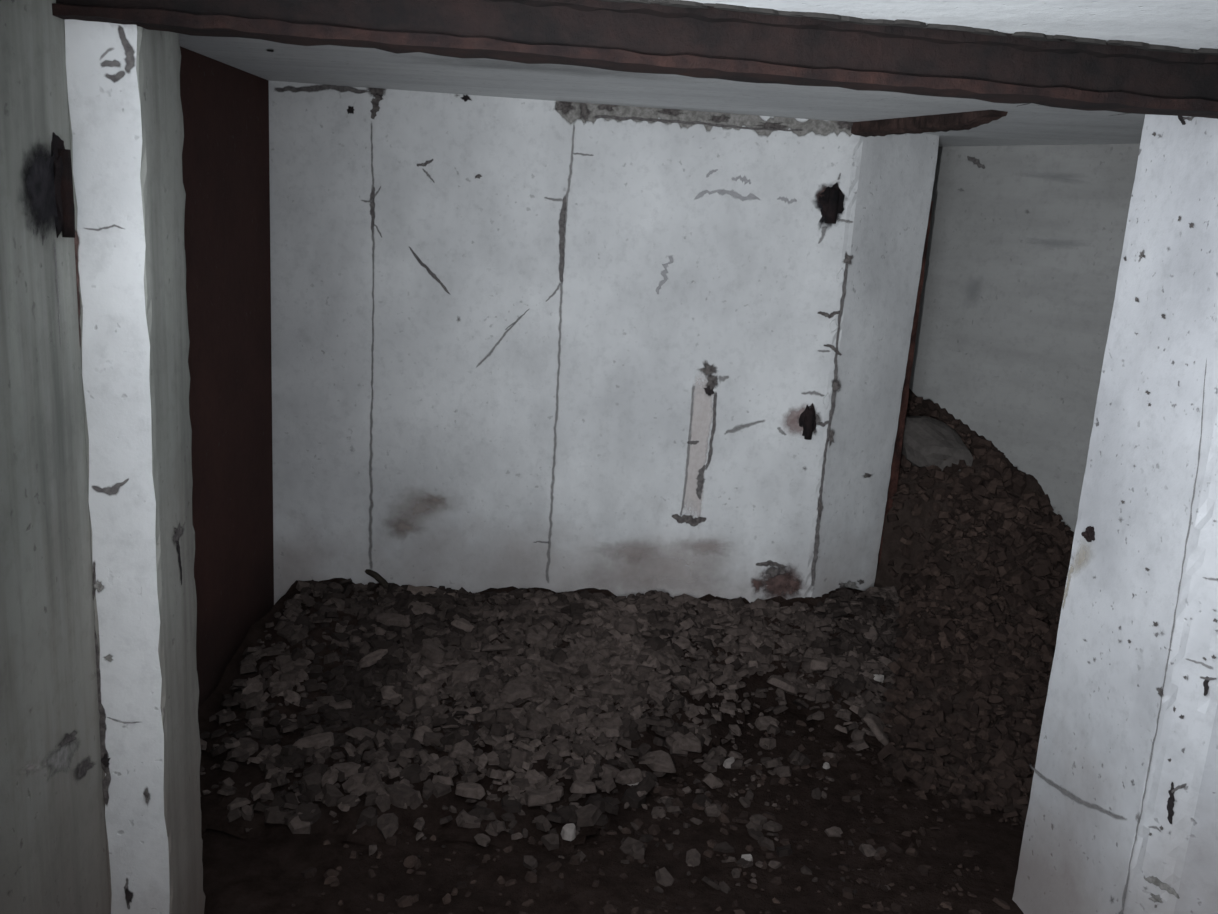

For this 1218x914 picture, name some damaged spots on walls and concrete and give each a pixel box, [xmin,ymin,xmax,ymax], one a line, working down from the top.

crack [275,84,367,94]
spalling [555,101,853,136]
crack [417,159,434,182]
crack [409,247,450,294]
crack [362,124,382,568]
crack [477,127,593,581]
spalling [700,361,718,396]
crack [804,253,853,586]